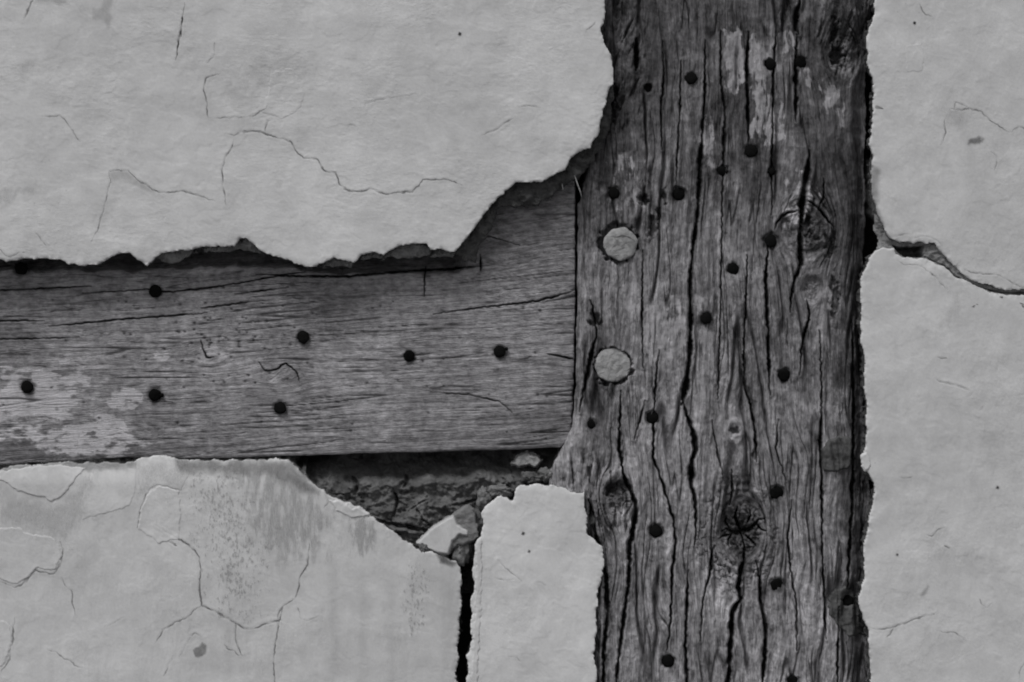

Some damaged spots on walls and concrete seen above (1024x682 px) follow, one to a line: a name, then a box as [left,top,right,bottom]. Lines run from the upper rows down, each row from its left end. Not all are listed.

crack [221,109,457,195]
flaking render [144,74,614,268]
crack [873,214,1024,308]
crack [158,539,308,675]
flaking render [188,447,583,682]